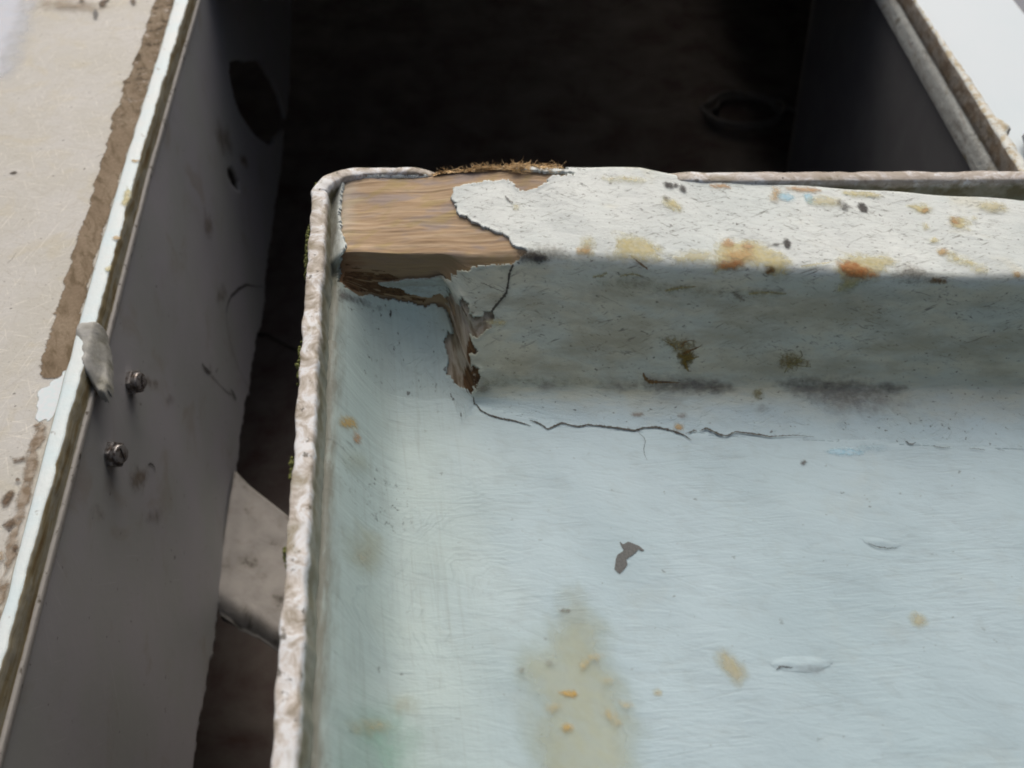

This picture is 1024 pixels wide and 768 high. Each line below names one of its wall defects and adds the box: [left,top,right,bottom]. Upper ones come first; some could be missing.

peeling [339,156,567,394]
crack [483,264,514,312]
corrosion [616,237,659,270]
corrosion [676,239,893,286]
crack [473,397,813,455]
peeling [615,542,644,574]